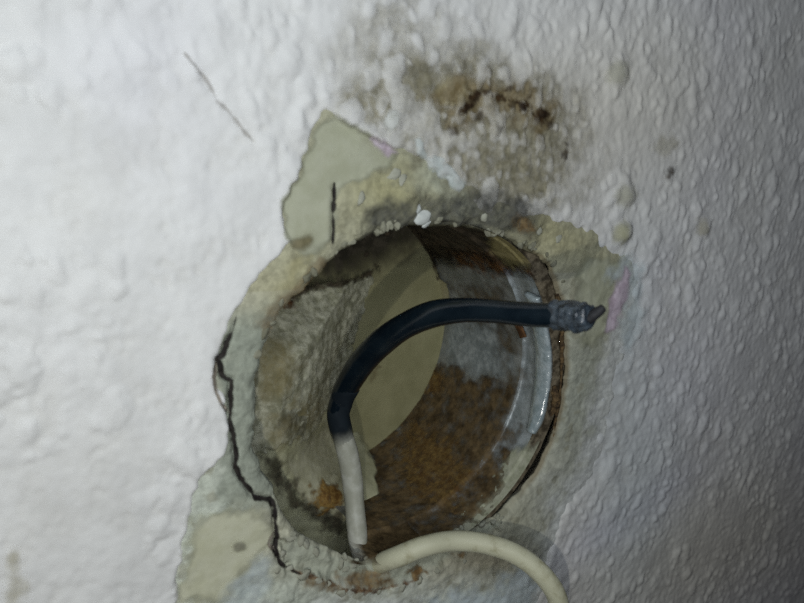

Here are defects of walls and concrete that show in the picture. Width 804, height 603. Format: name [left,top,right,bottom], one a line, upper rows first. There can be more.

peeling [282,117,407,254]
water stain [346,80,391,123]
spalling [413,204,443,228]
peeling [416,139,464,190]
water stain [402,51,571,207]
spalling [480,213,505,238]
peeling [576,257,630,347]
crack [212,319,300,574]
rust [299,364,516,594]
peeling [179,511,273,603]